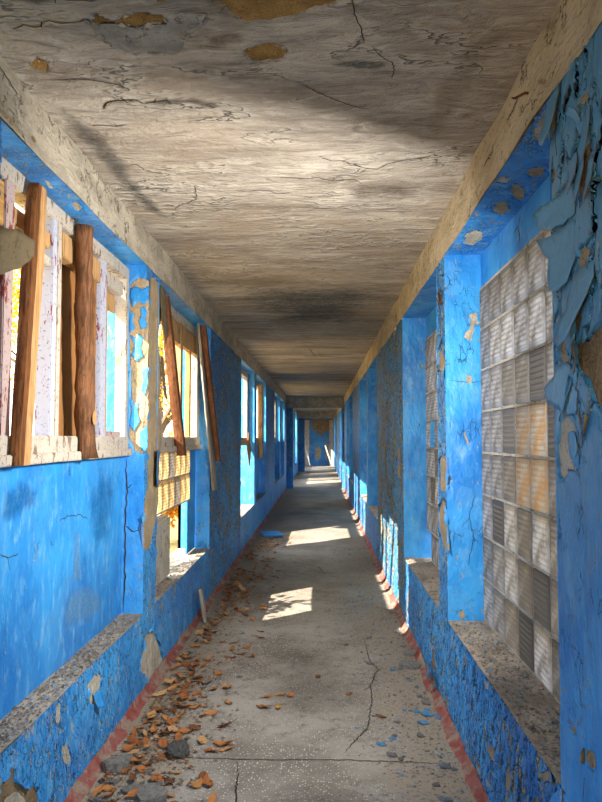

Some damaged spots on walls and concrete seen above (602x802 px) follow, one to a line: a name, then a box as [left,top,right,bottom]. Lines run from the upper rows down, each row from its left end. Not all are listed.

crack [14,0,111,32]
spalling [82,12,208,58]
spalling [209,0,335,21]
crack [351,0,395,79]
crack [66,79,171,129]
crack [298,82,366,109]
peeling [0,228,35,275]
spalling [463,230,486,245]
peeling [530,82,602,483]
peeling [129,277,168,554]
crack [110,637,440,802]
spalling [0,765,41,802]